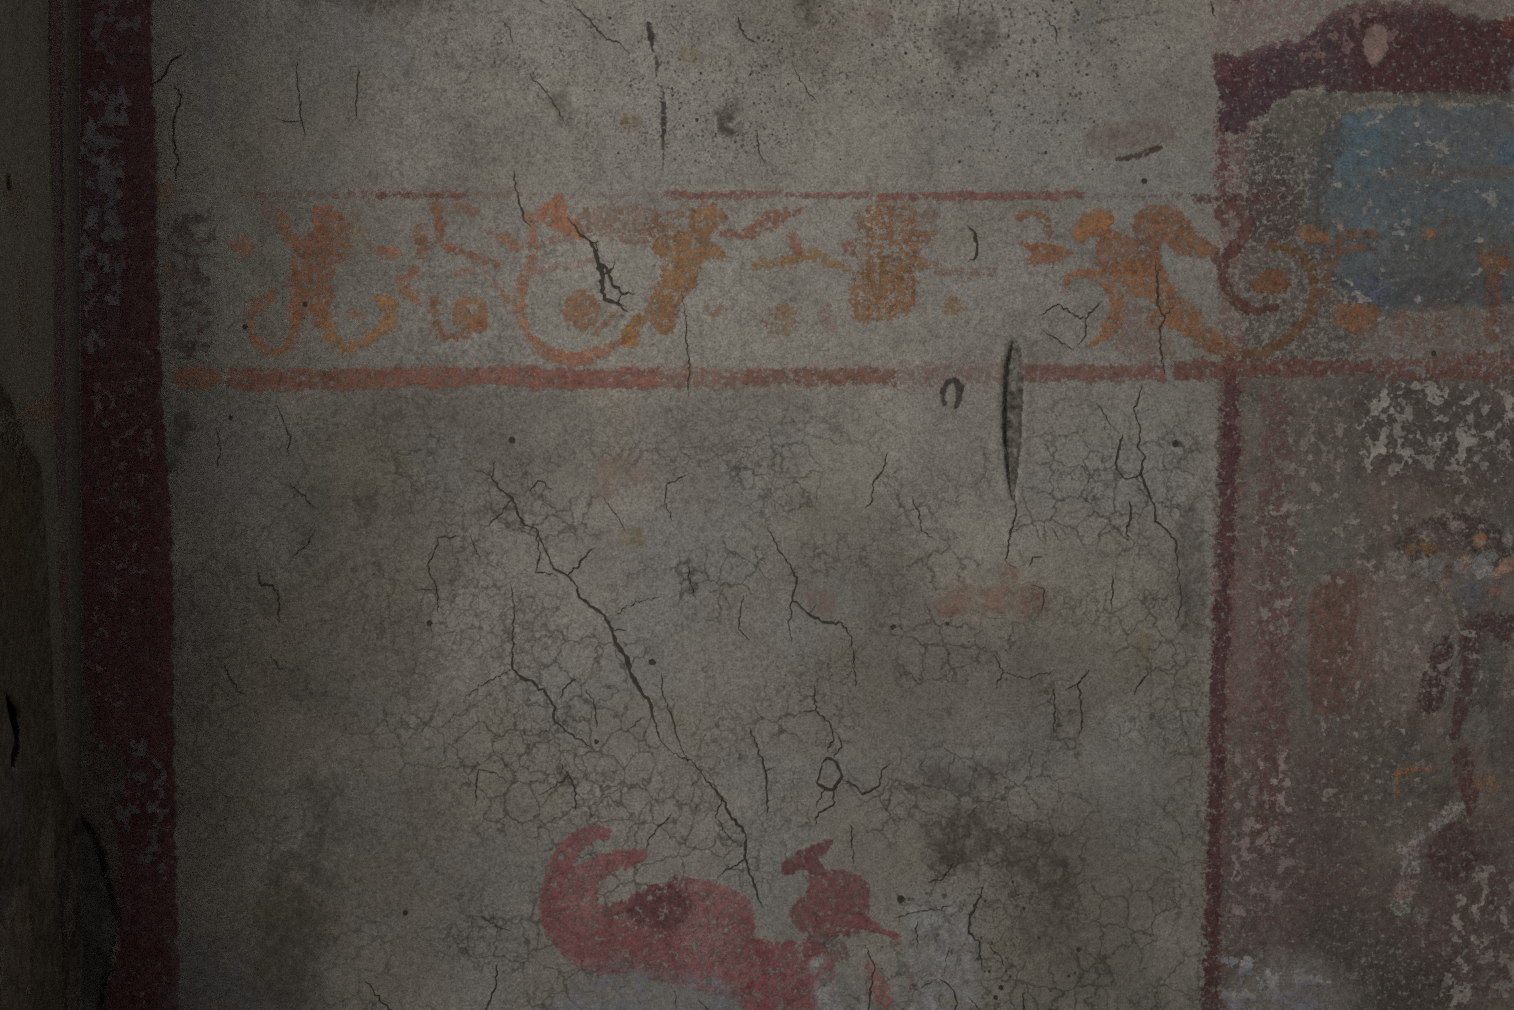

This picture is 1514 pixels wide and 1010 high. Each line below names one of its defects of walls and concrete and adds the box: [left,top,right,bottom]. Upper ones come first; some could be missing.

peeling [79,81,131,354]
crack [567,217,635,312]
peeling [1332,268,1393,303]
peeling [1340,114,1480,213]
peeling [91,378,155,656]
crack [427,461,773,905]
crack [767,528,856,686]
crack [1095,261,1182,621]
peeling [1249,336,1514,827]
peeling [99,734,171,887]
crack [802,686,888,864]
crack [895,862,1058,1010]